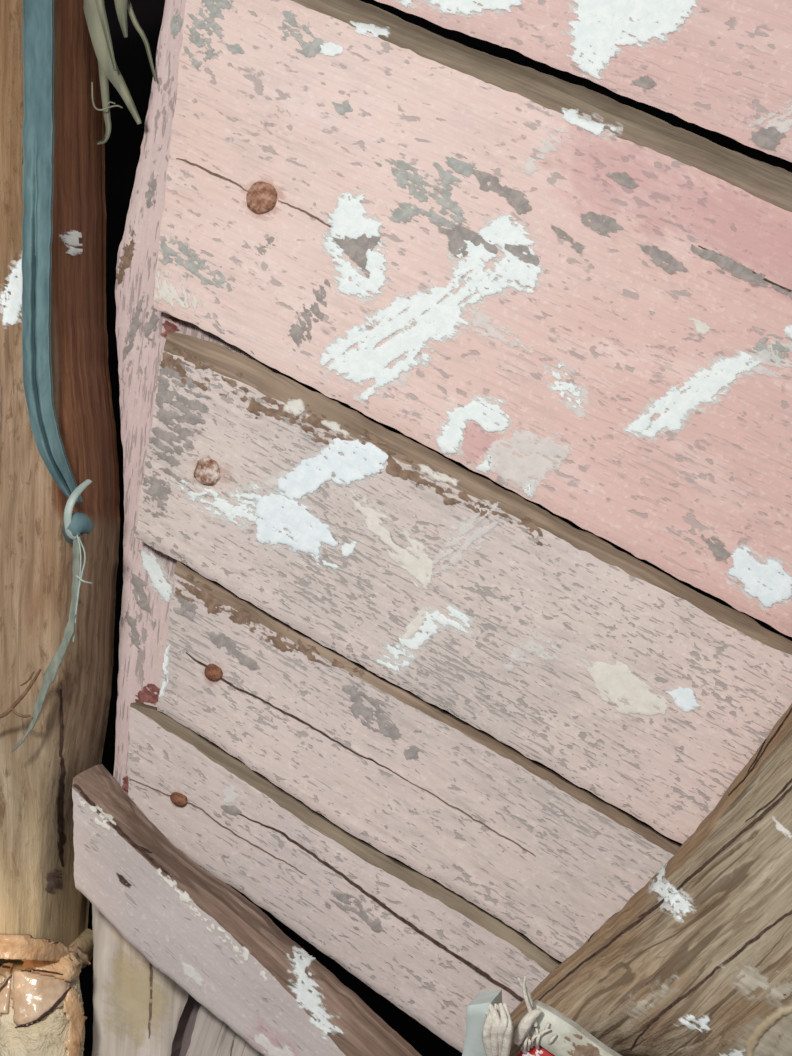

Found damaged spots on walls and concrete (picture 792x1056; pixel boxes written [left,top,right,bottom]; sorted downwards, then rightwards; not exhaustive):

crack [176,158,248,192]
crack [278,200,331,228]
peeling [333,233,380,278]
peeling [375,154,539,266]
peeling [752,334,792,361]
peeling [142,345,543,546]
crack [186,652,536,857]
crack [129,778,792,1002]
crack [609,966,665,1015]
crack [630,910,792,1050]